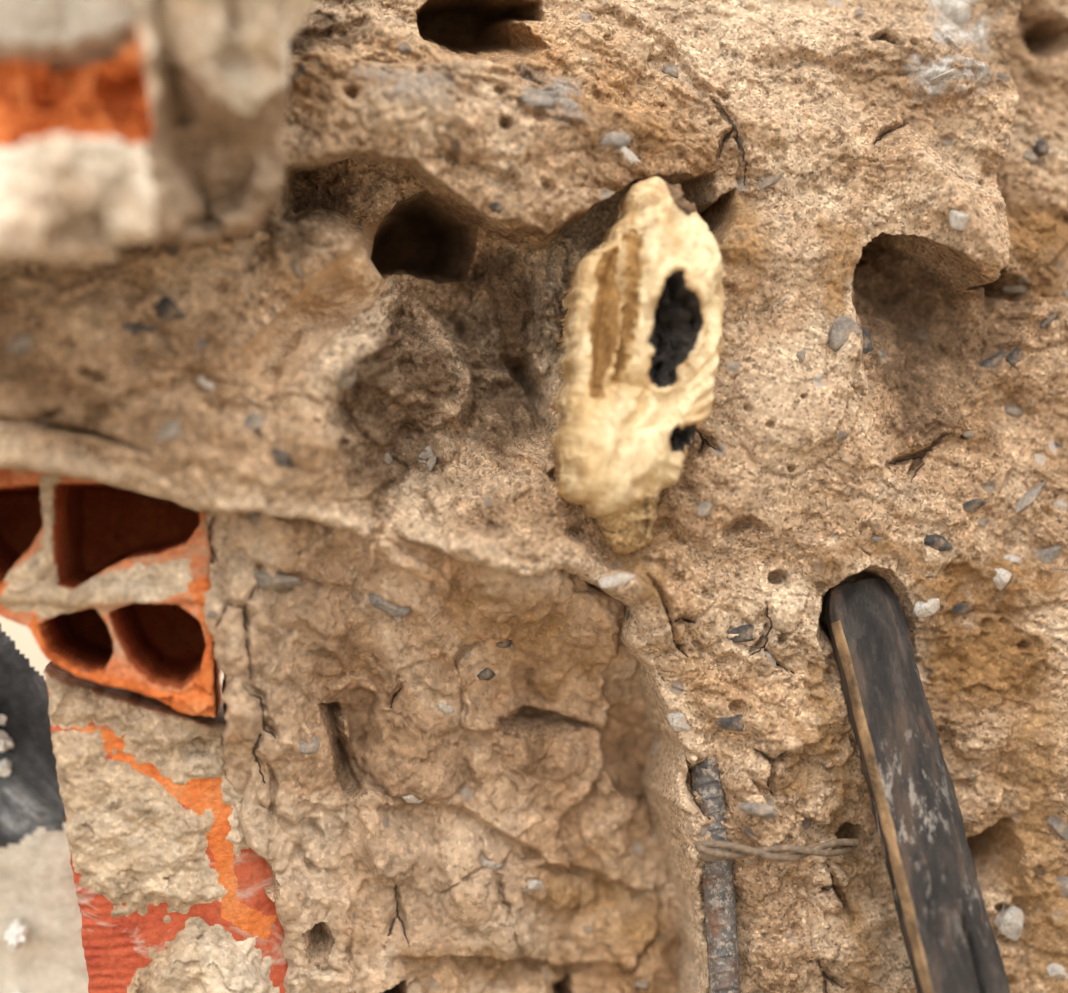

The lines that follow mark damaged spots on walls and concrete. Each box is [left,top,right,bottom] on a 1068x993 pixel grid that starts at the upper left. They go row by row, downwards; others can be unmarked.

crack [0,413,157,457]
peeling [0,623,228,923]
spalling [251,848,280,905]